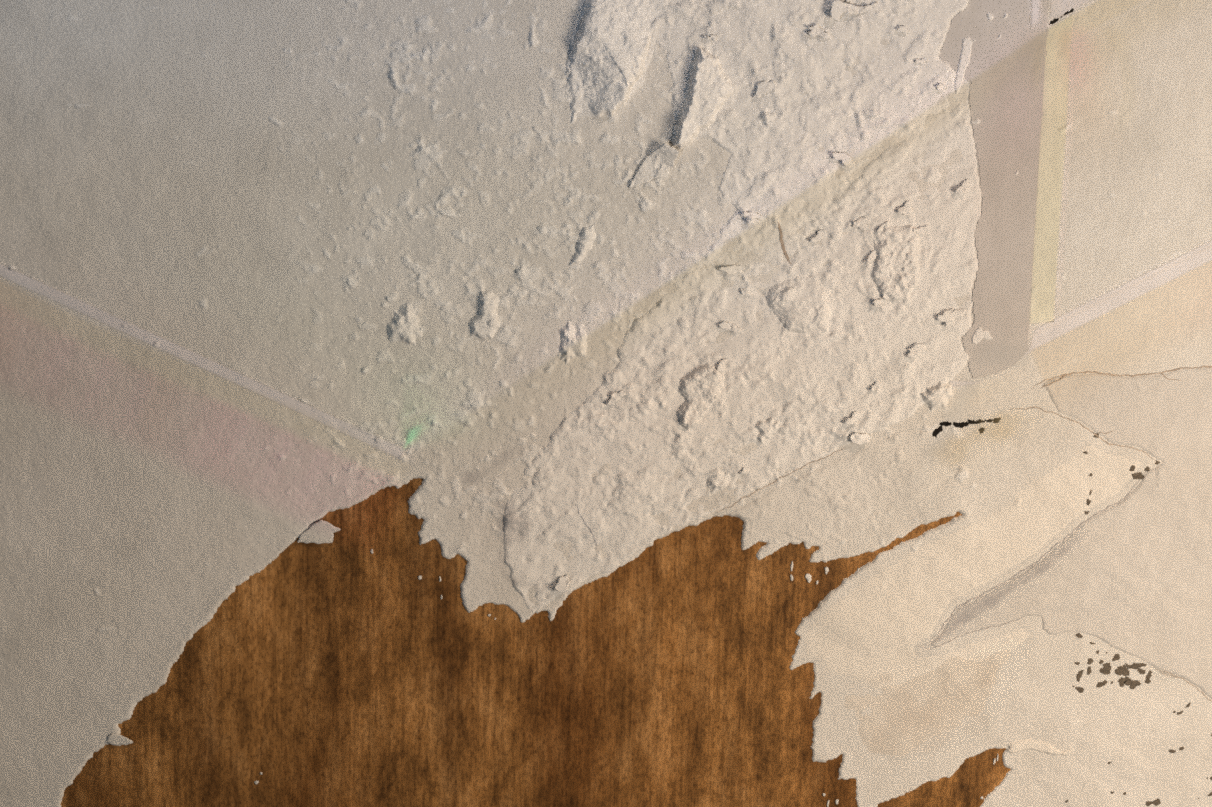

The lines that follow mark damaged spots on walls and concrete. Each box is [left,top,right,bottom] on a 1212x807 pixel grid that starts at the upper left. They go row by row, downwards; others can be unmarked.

peeling [61,0,1018,807]
peeling [877,739,1074,807]
peeling [804,445,1153,756]
crack [917,366,1212,650]
crack [1157,669,1212,701]